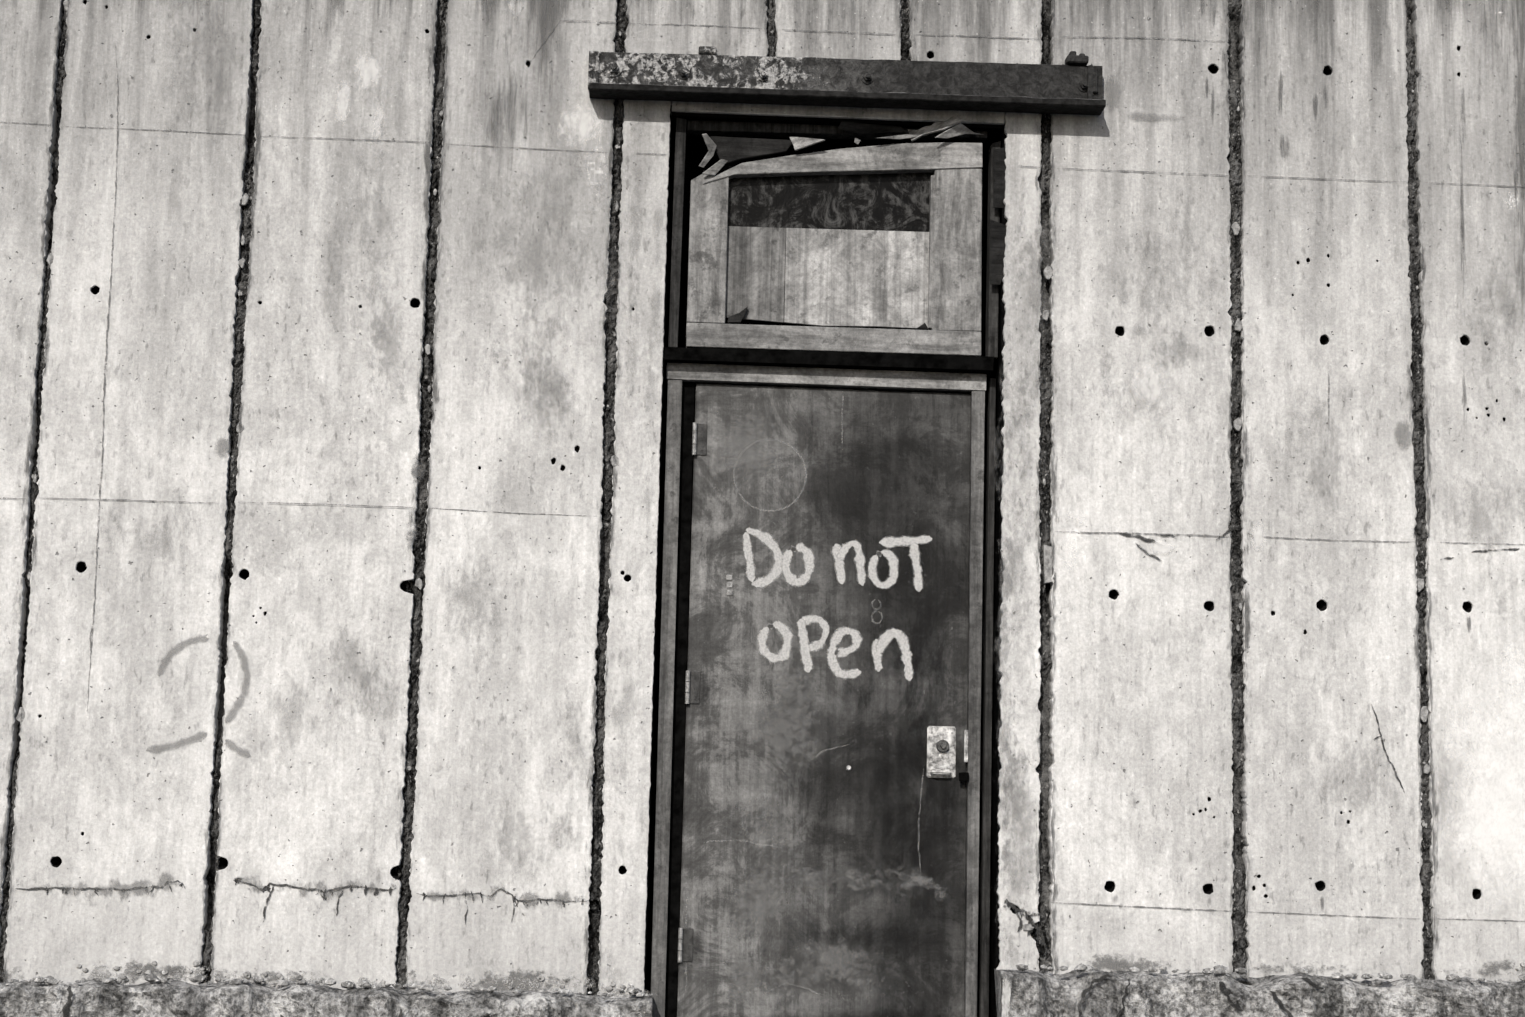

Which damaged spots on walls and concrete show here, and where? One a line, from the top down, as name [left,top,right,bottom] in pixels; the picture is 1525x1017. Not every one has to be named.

water stain [1515,0,1525,193]
crack [1371,704,1404,791]
crack [15,880,185,895]
crack [233,878,586,925]